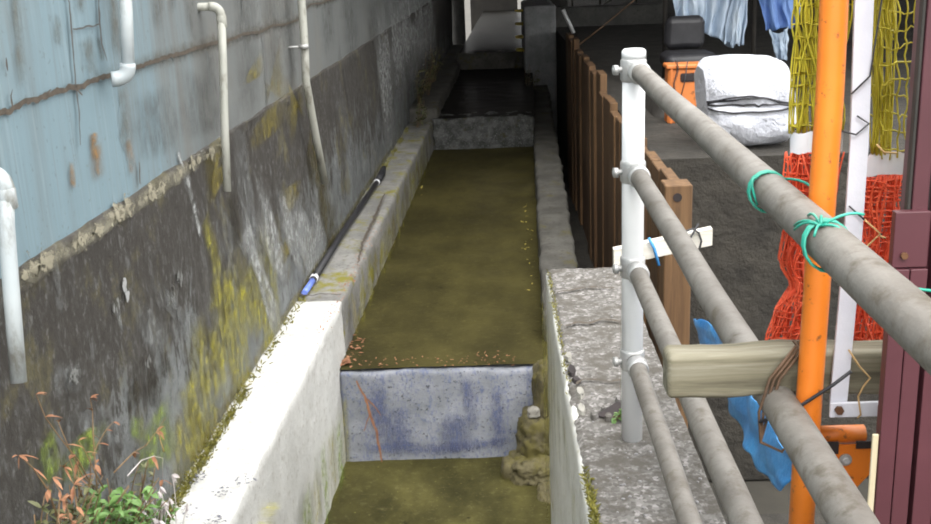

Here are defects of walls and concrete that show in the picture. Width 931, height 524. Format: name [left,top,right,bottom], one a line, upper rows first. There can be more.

crack [0,0,111,145]
crack [136,0,329,117]
corrosion [91,133,100,173]
spalling [21,144,221,281]
leakage [370,382,502,452]